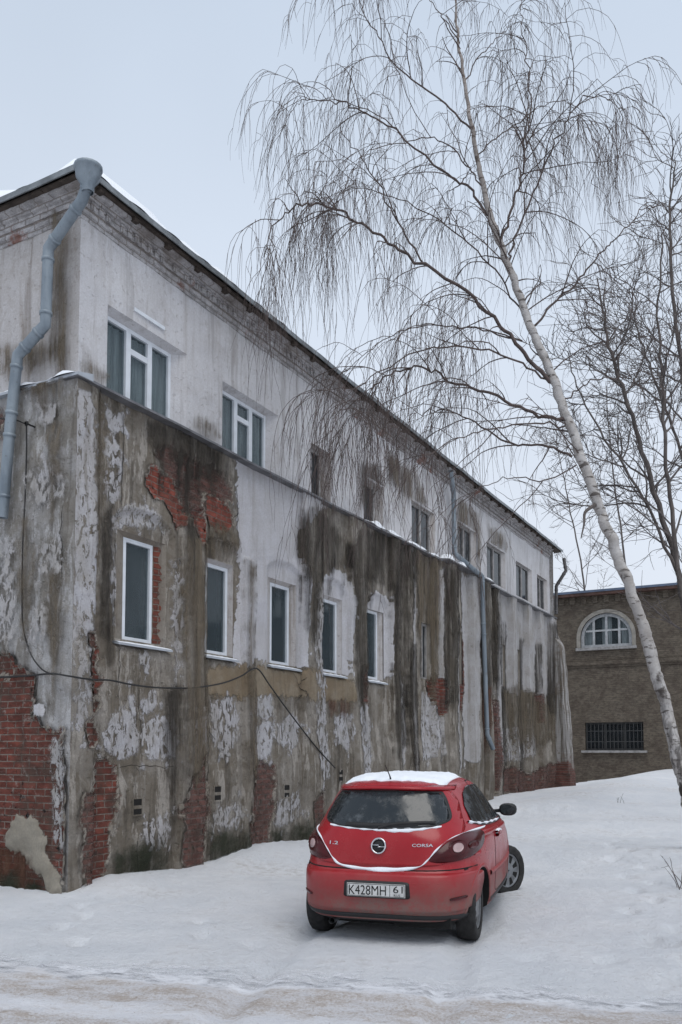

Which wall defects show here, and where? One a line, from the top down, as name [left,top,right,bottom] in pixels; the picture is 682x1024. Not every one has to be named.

leakage [98,394,113,664]
leakage [148,417,239,790]
peeling [0,388,558,891]
leakage [297,505,460,771]
leakage [459,499,507,569]
leakage [480,585,558,776]
leakage [115,844,167,874]
leakage [211,831,252,861]